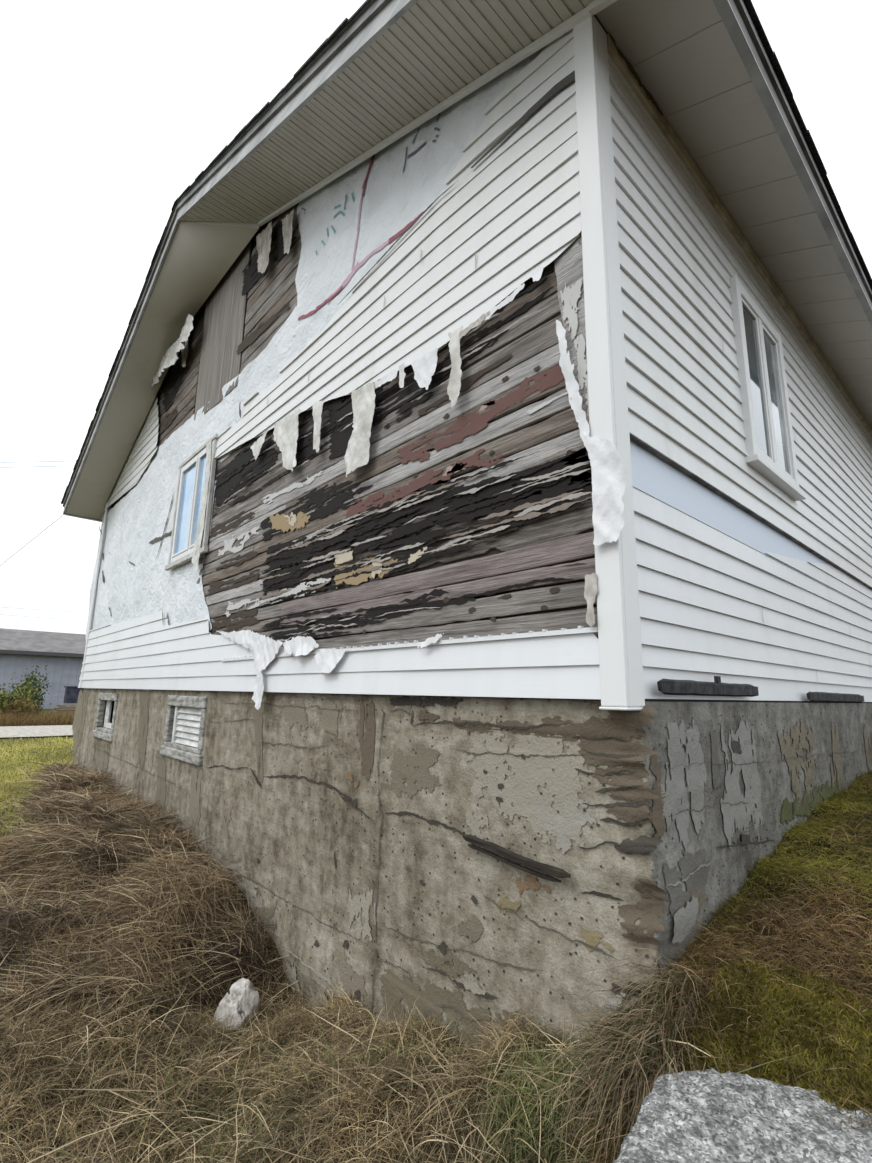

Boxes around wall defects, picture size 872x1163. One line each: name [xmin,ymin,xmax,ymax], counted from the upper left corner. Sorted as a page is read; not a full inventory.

peeling [560,279,589,417]
crack [207,702,587,1026]
spalling [614,835,664,855]
spalling [634,879,669,902]